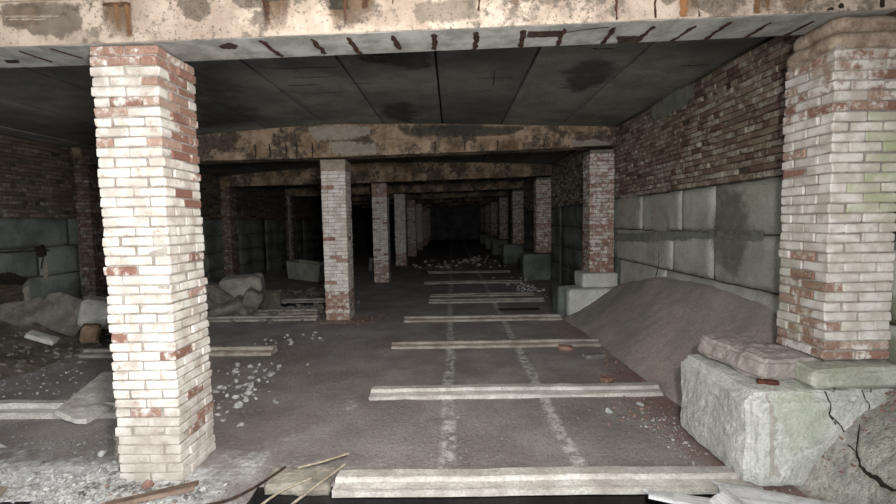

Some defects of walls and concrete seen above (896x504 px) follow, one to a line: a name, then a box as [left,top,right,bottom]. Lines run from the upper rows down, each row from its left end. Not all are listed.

corrosion [103,2,132,35]
corrosion [262,0,287,19]
corrosion [680,0,696,17]
damp [564,60,612,91]
crack [824,388,896,492]